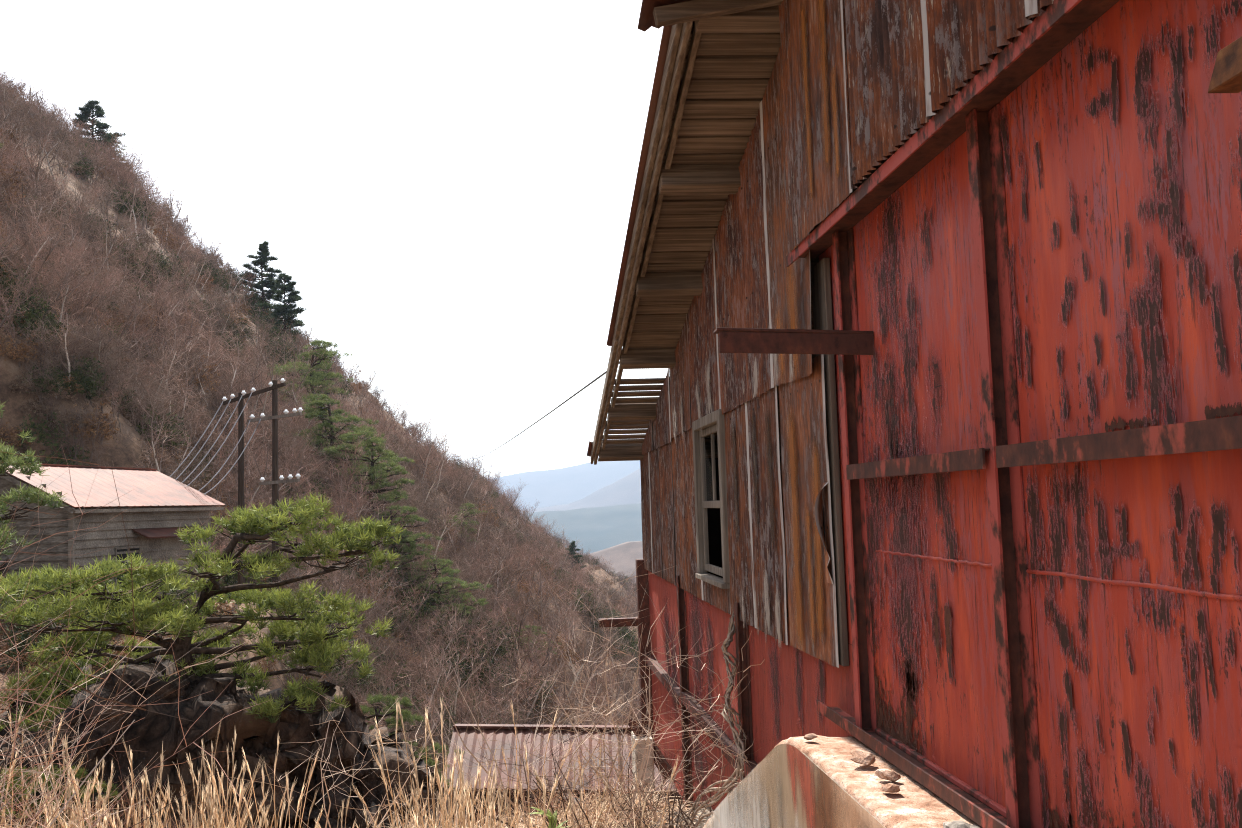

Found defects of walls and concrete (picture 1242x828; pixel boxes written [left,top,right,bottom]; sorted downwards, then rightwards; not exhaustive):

peeling [1000,113,1043,224]
peeling [1051,0,1242,427]
peeling [1007,243,1032,389]
corrosion [1105,415,1157,432]
corrosion [1205,402,1242,420]
corrosion [787,416,823,645]
corrosion [870,600,927,755]
corrosion [932,603,953,667]
corrosion [787,744,885,828]